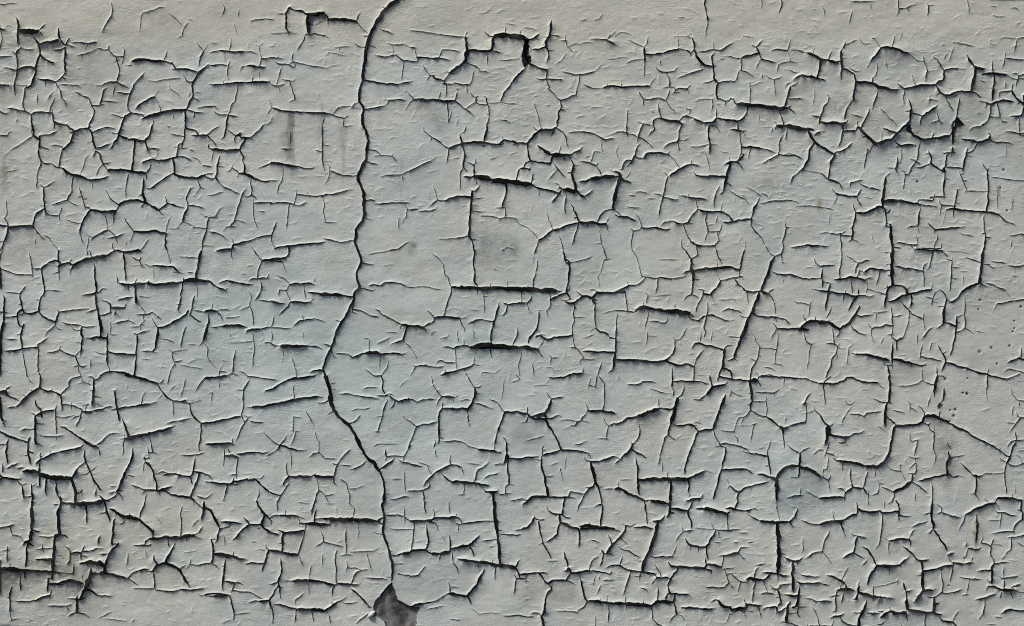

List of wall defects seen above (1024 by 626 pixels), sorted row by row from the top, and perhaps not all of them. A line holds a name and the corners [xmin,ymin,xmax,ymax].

crack [210,42,324,70]
crack [376,43,459,78]
crack [867,34,934,78]
crack [584,62,690,113]
crack [259,161,315,192]
crack [196,350,237,390]
crack [342,361,432,432]
crack [961,463,998,501]
crack [843,532,867,565]
crack [285,551,372,623]
spalling [368,582,420,626]
crack [681,604,716,612]